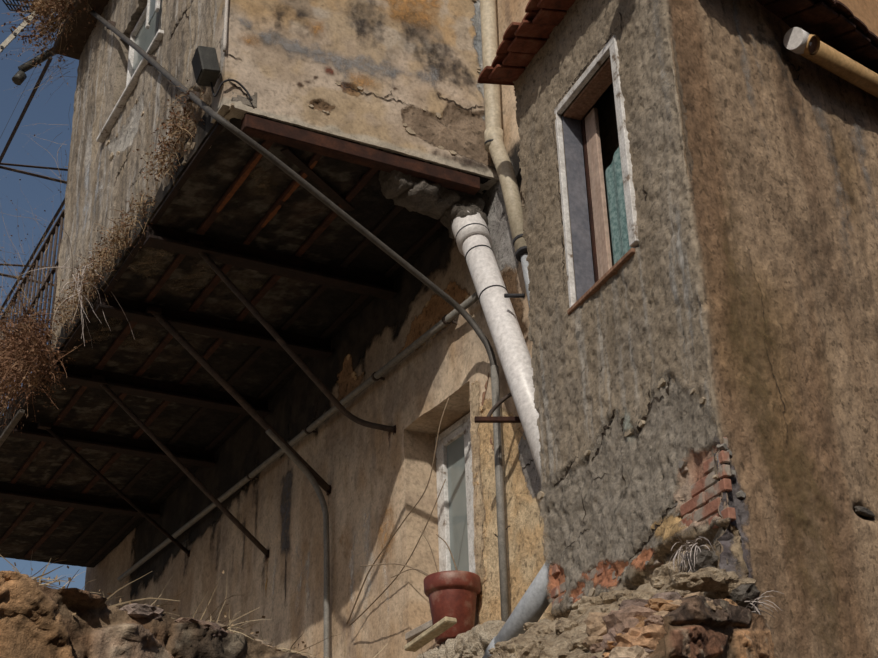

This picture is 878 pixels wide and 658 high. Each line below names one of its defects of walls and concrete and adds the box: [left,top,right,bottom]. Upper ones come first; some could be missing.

leakage [260,32,401,77]
crack [344,85,413,106]
leakage [415,43,473,84]
flaking render [401,102,496,169]
crack [436,93,483,115]
peeling [471,0,484,98]
flaking render [396,281,470,356]
crack [554,376,670,549]
flaking render [469,370,760,625]
crack [629,500,685,560]